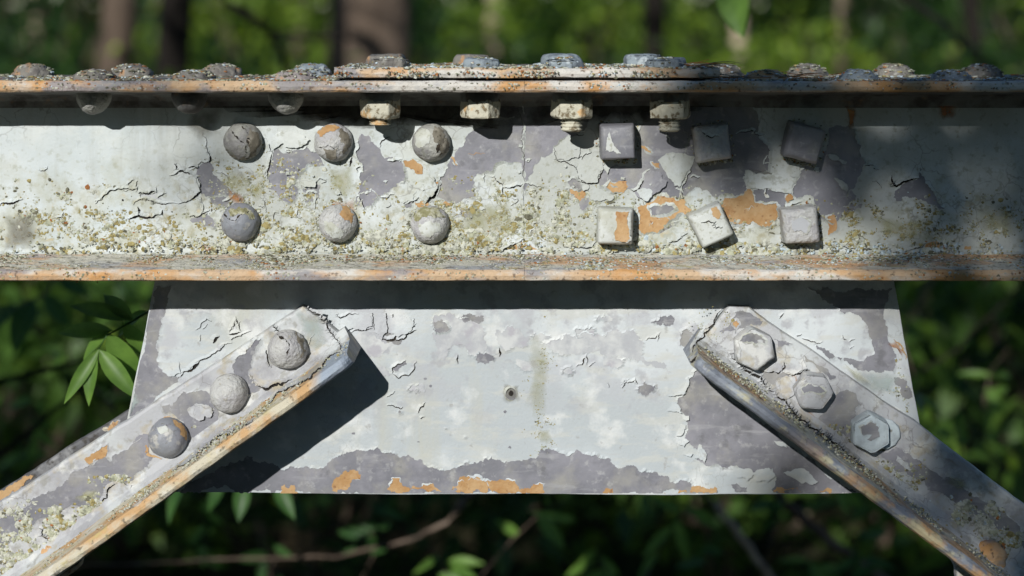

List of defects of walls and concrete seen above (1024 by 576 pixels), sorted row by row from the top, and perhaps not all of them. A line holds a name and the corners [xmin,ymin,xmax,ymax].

crack [93,126,439,222]
peeling [226,106,867,247]
crack [630,169,700,200]
rust [613,196,692,243]
rust [711,189,793,229]
crack [172,306,425,471]
rust [84,420,120,466]
peeling [0,284,219,548]
peeling [667,368,856,493]
rust [331,470,361,492]
peeling [180,446,718,493]
rust [387,474,545,493]